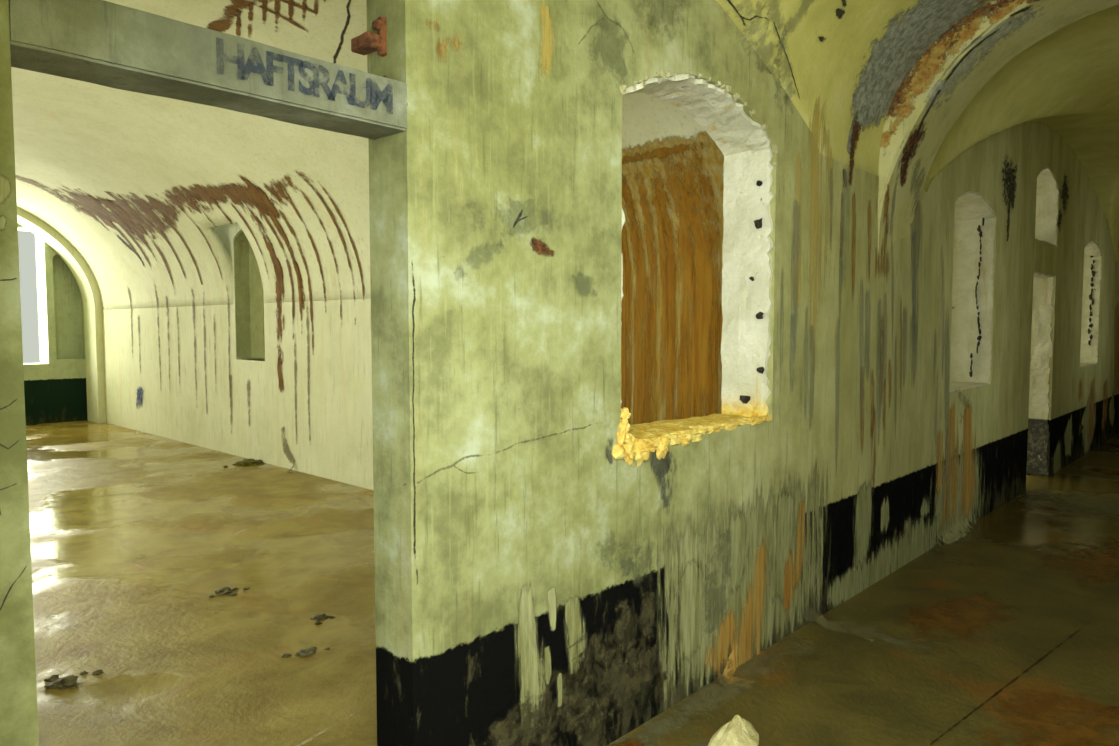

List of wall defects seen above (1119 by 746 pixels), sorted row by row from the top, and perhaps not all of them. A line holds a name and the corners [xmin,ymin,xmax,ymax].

rust [207,0,326,36]
crack [579,3,628,44]
crack [727,0,800,99]
spalling [847,0,989,155]
crack [886,0,1039,158]
spalling [925,9,1041,106]
rust [45,171,364,391]
crack [1087,256,1095,346]
crack [0,567,26,610]